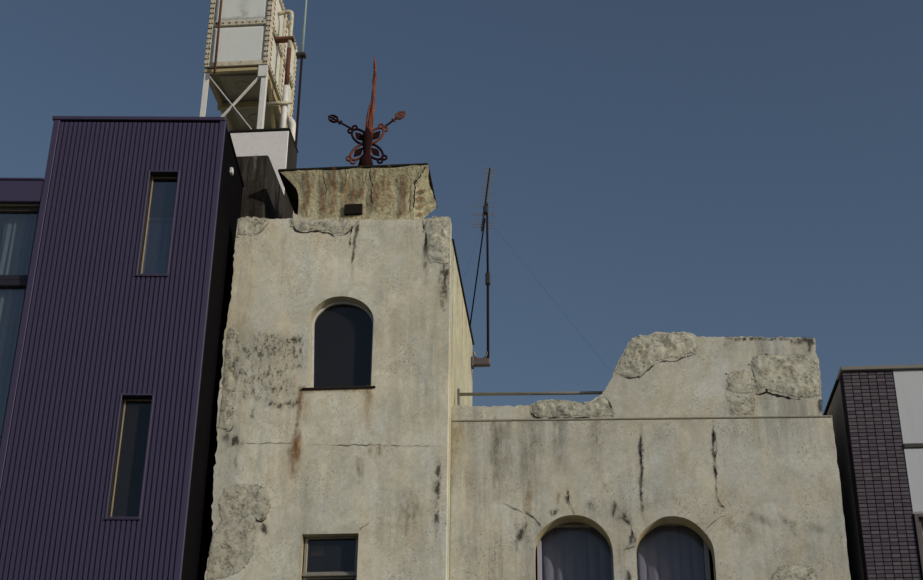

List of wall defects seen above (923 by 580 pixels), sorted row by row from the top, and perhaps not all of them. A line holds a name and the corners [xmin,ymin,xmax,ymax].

damp [232,335,299,408]
spalling [530,397,614,419]
spalling [615,332,698,379]
spalling [207,484,271,580]
crack [623,424,644,556]
crack [709,422,727,527]